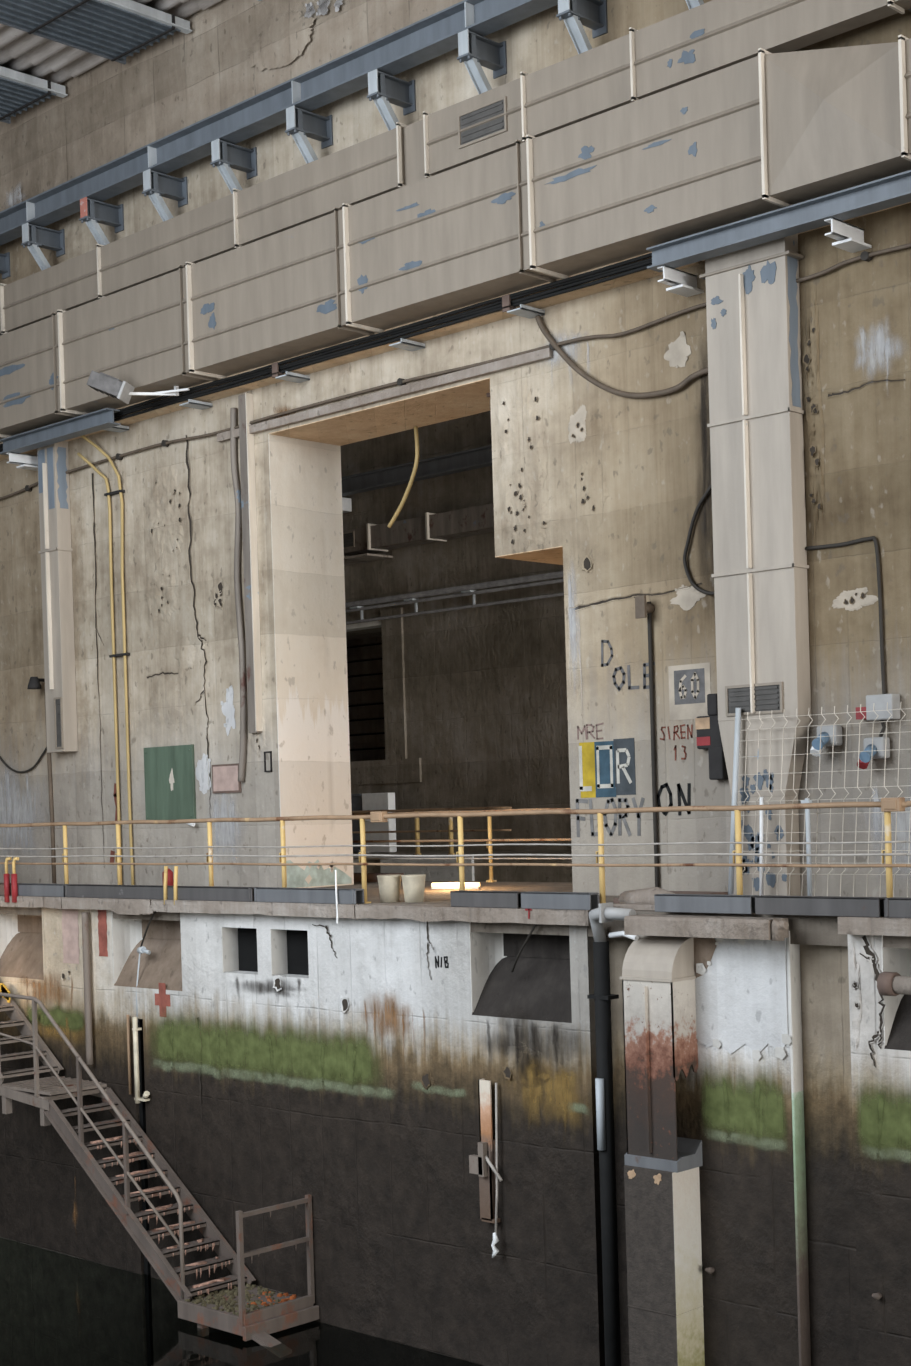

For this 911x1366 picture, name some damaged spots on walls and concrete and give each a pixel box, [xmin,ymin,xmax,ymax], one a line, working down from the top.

crack [146,435,211,818]
leakage [258,1036,388,1095]
crack [859,935,886,1068]